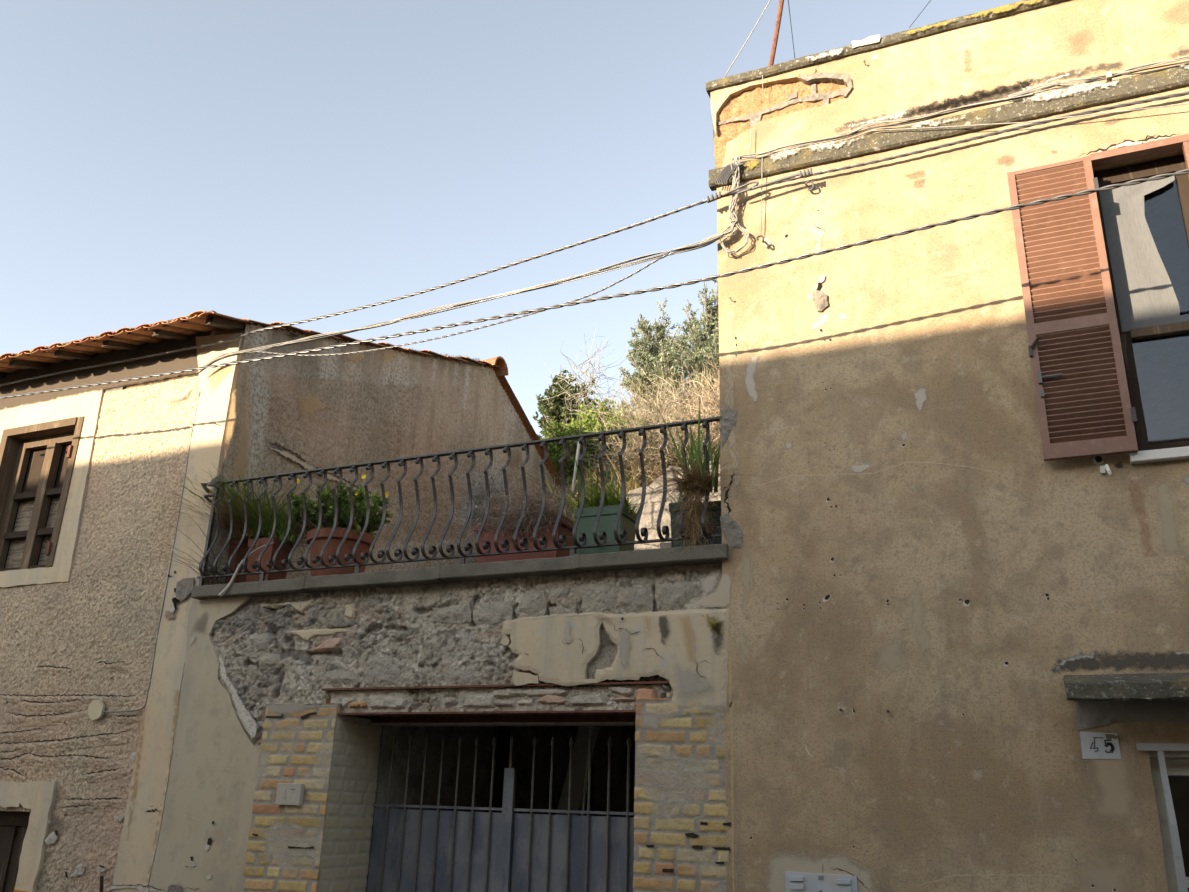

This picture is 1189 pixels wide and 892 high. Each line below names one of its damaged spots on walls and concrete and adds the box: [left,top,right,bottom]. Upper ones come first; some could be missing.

spalling [714,72,853,168]
spalling [806,275,829,312]
spalling [212,563,729,746]